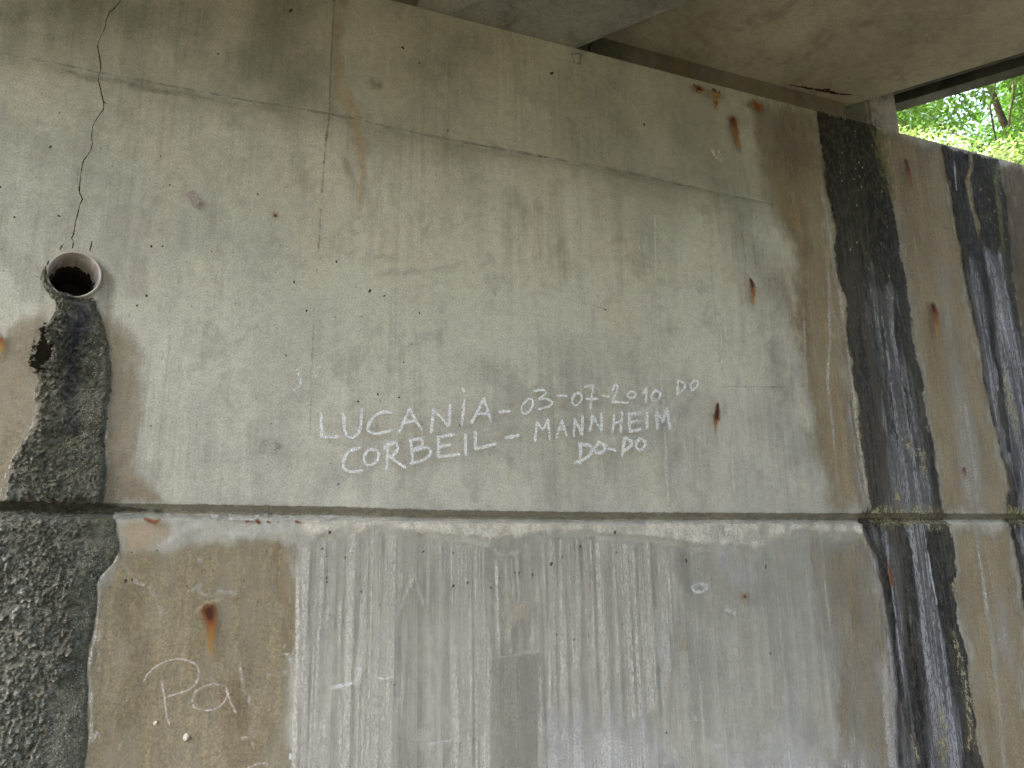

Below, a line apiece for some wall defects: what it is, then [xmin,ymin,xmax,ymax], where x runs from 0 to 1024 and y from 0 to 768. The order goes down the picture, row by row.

crack [60,0,121,251]
corrosion [730,116,741,149]
spalling [26,322,58,374]
corrosion [201,604,217,657]
damp [0,261,891,768]
damp [757,111,864,509]
damp [875,129,1024,768]